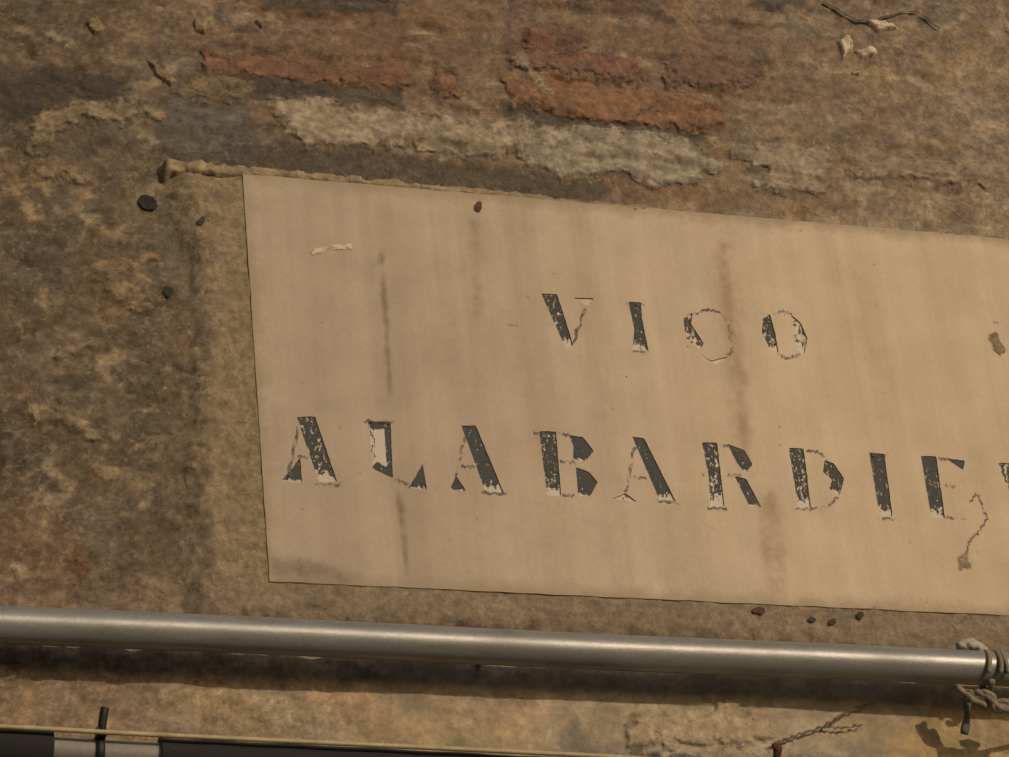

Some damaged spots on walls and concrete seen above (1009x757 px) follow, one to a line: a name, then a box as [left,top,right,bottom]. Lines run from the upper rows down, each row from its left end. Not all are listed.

peeling [146,60,176,86]
spalling [198,47,417,108]
spalling [502,20,766,147]
crack [771,703,875,745]